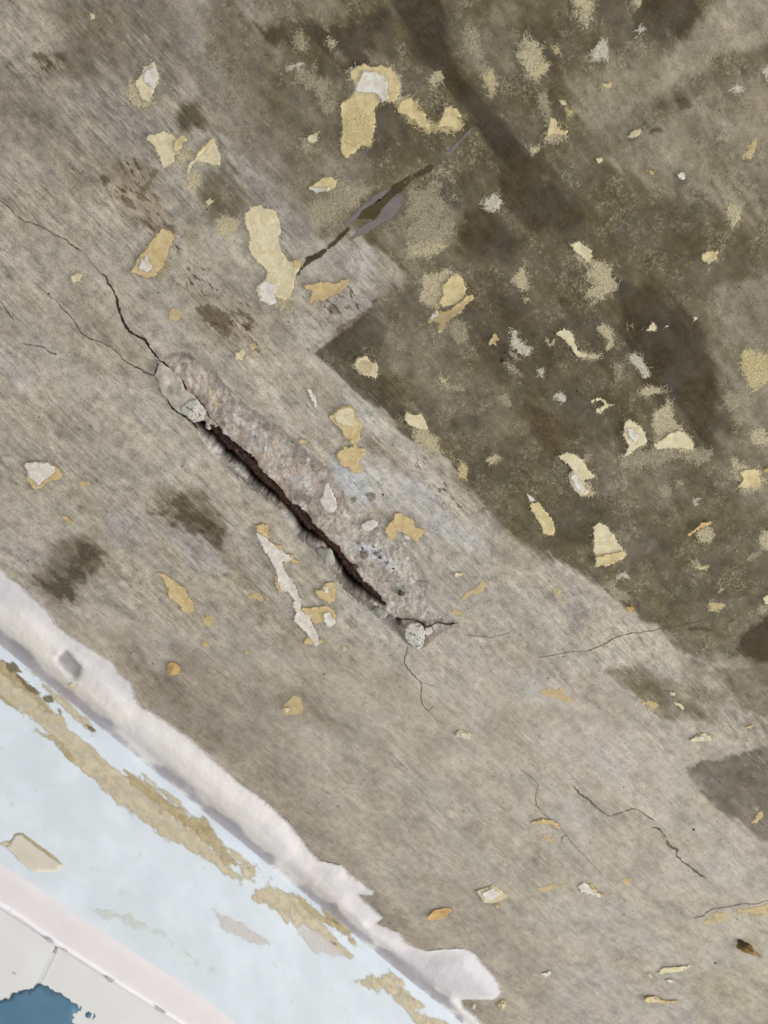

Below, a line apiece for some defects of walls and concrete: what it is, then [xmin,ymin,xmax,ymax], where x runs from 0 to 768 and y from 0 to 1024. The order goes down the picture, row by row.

leakage [296,227,350,275]
crack [0,200,219,429]
spalling [154,351,457,649]
crack [398,618,512,638]
peeling [0,569,502,1024]
crack [522,770,600,872]
crack [573,778,706,878]